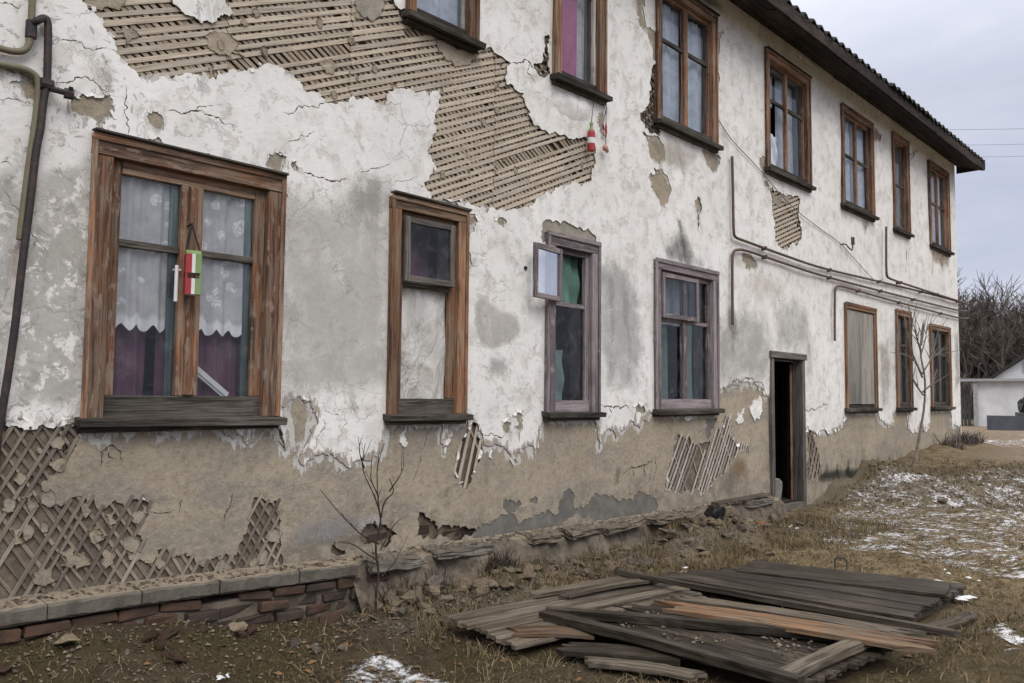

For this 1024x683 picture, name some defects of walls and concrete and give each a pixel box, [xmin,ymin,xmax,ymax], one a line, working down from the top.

crack [164,105,233,125]
crack [284,102,327,142]
flaking render [82,0,606,269]
crack [305,164,413,182]
flaking render [635,0,672,208]
flaking render [759,155,802,250]
crack [316,399,373,484]
peeling [0,381,770,599]
peeling [806,411,962,505]